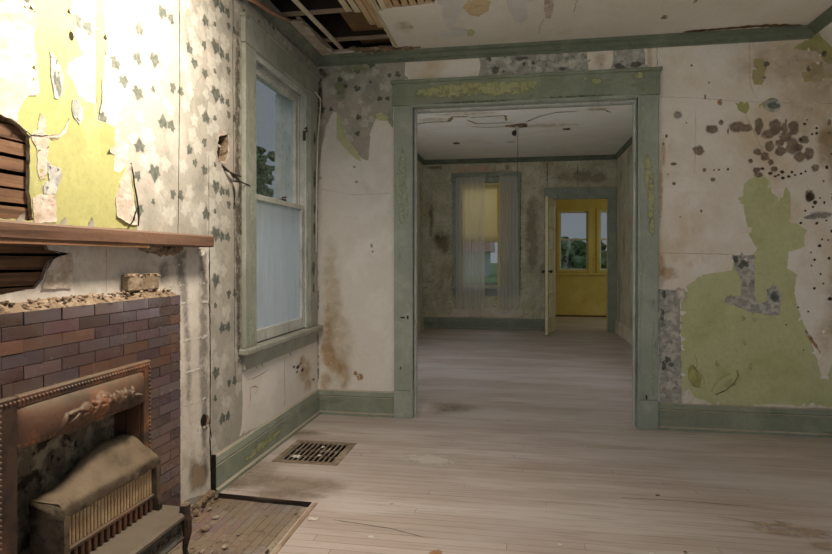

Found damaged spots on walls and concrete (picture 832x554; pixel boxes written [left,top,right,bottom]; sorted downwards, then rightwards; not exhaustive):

peeling [462,0,491,17]
spalling [0,0,50,182]
peeling [416,80,538,104]
water stain [706,118,828,180]
spalling [17,194,67,225]
spalling [115,164,138,225]
water stain [799,190,831,225]
flaking render [0,245,211,504]